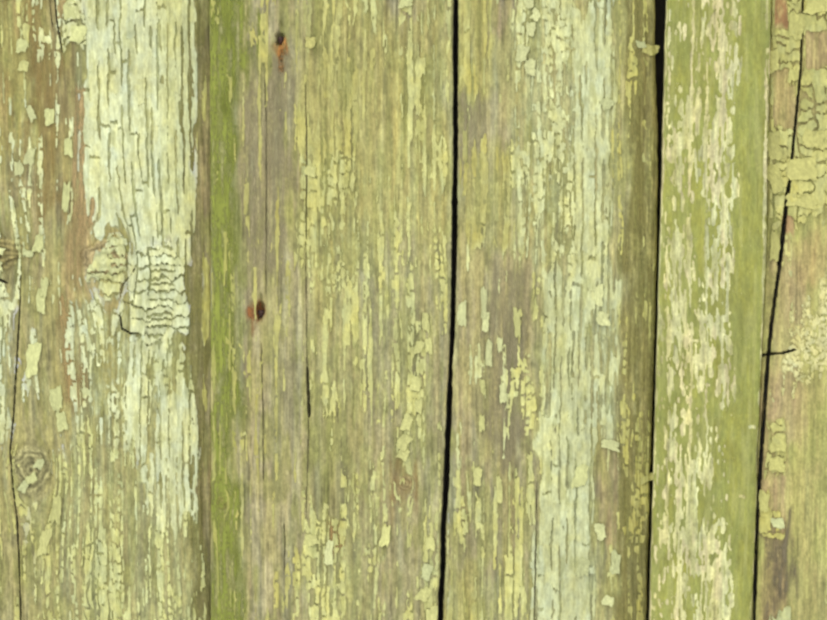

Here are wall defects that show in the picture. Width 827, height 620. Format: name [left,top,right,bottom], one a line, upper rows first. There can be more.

peeling [0,282,18,444]
crack [0,258,21,620]
peeling [14,0,207,620]
peeling [211,231,247,620]
corrosion [247,301,264,319]
peeling [293,446,391,620]
peeling [294,0,451,475]
peeling [414,0,653,620]
peeling [662,0,742,620]
peeling [759,489,785,540]
crack [753,35,802,620]
peeling [781,278,827,397]